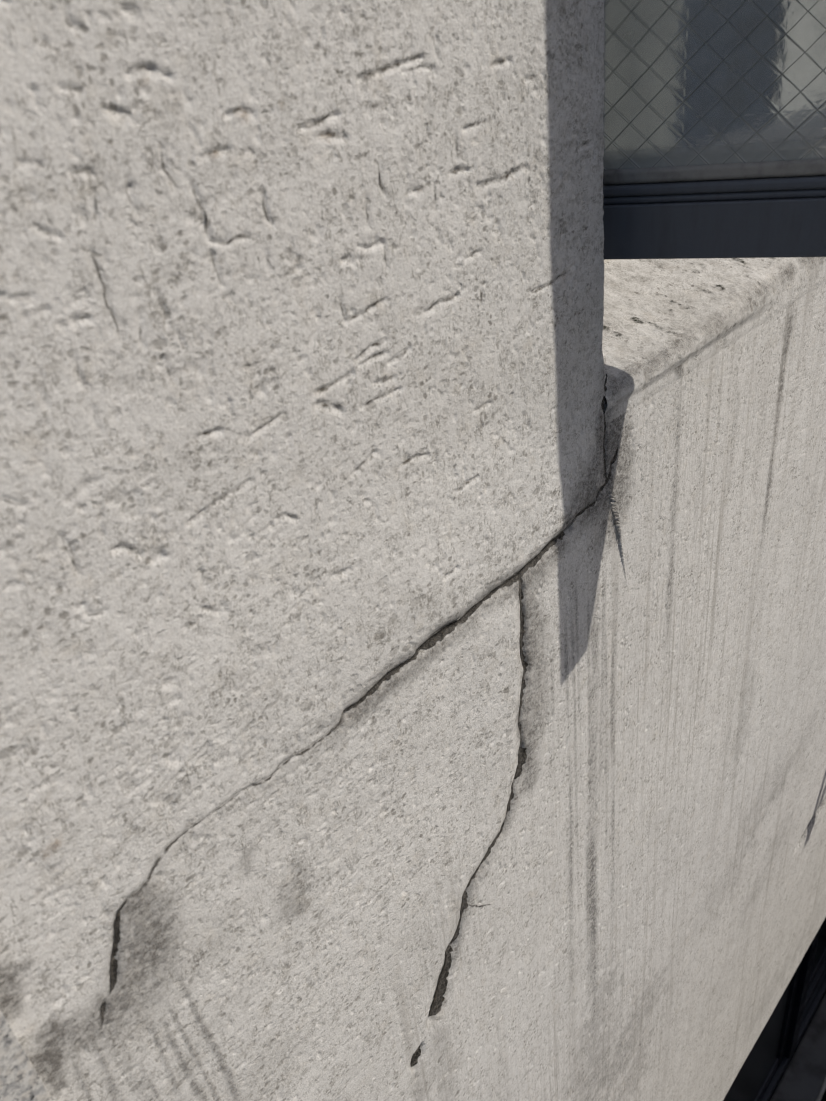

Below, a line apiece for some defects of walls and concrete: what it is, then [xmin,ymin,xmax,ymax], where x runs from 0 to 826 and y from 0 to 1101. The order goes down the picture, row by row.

crack [101,374,618,1026]